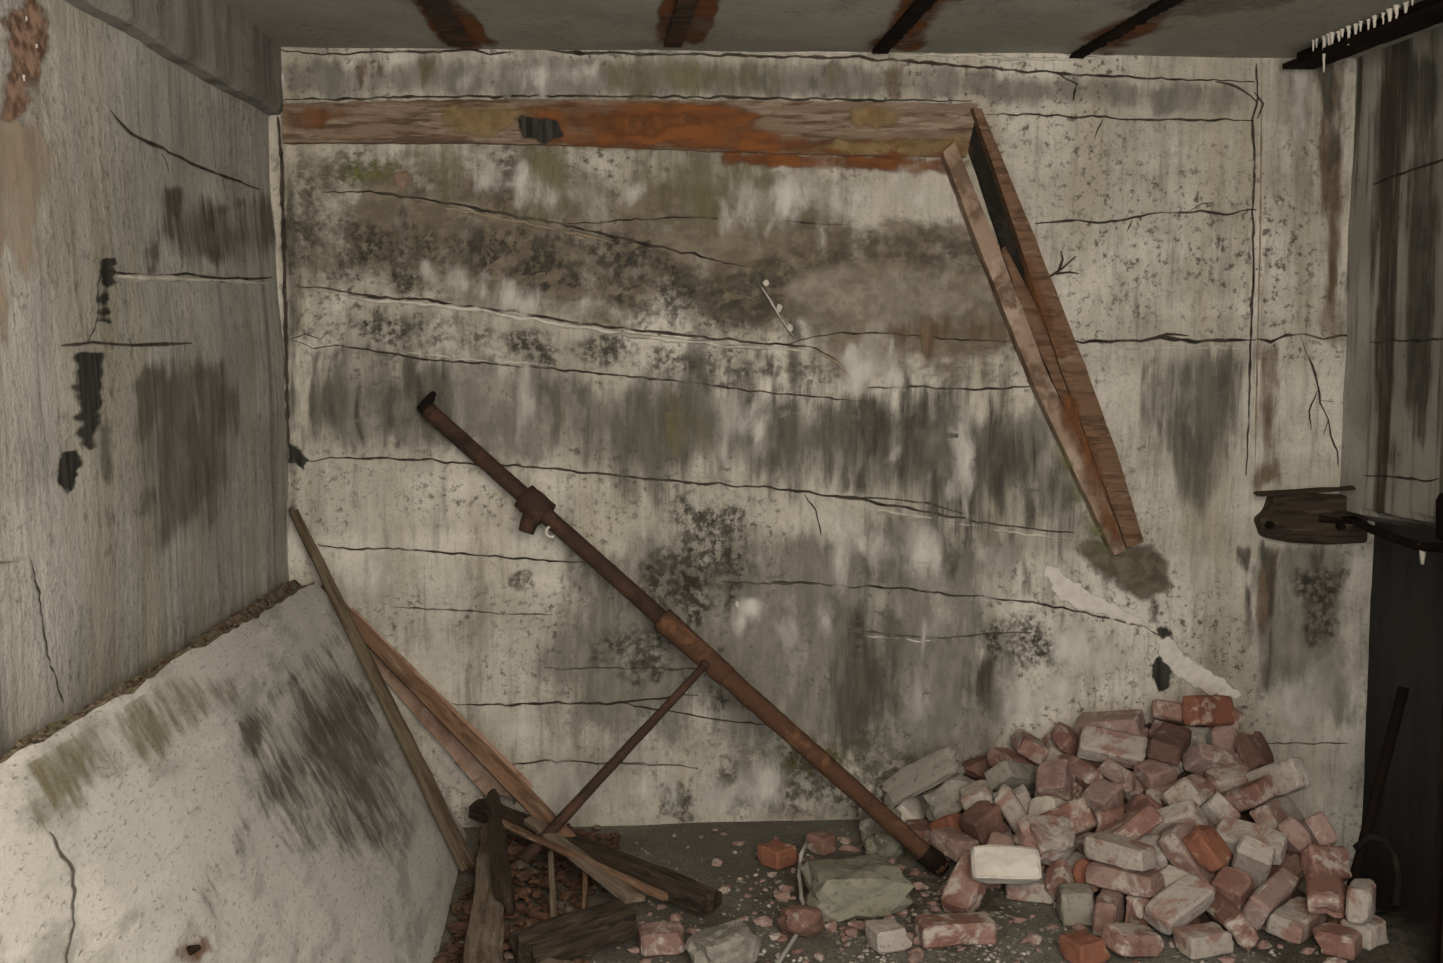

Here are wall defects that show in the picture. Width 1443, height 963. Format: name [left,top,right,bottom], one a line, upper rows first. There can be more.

rust [413,0,496,50]
rust [658,0,676,40]
rust [684,0,719,44]
damp [339,221,694,324]
crack [61,48,1443,541]
damp [814,317,1036,578]
damp [1144,351,1241,505]
crack [320,545,585,563]
damp [643,497,745,626]
crack [723,581,1161,642]
spalling [1044,565,1241,699]
crack [452,667,766,725]